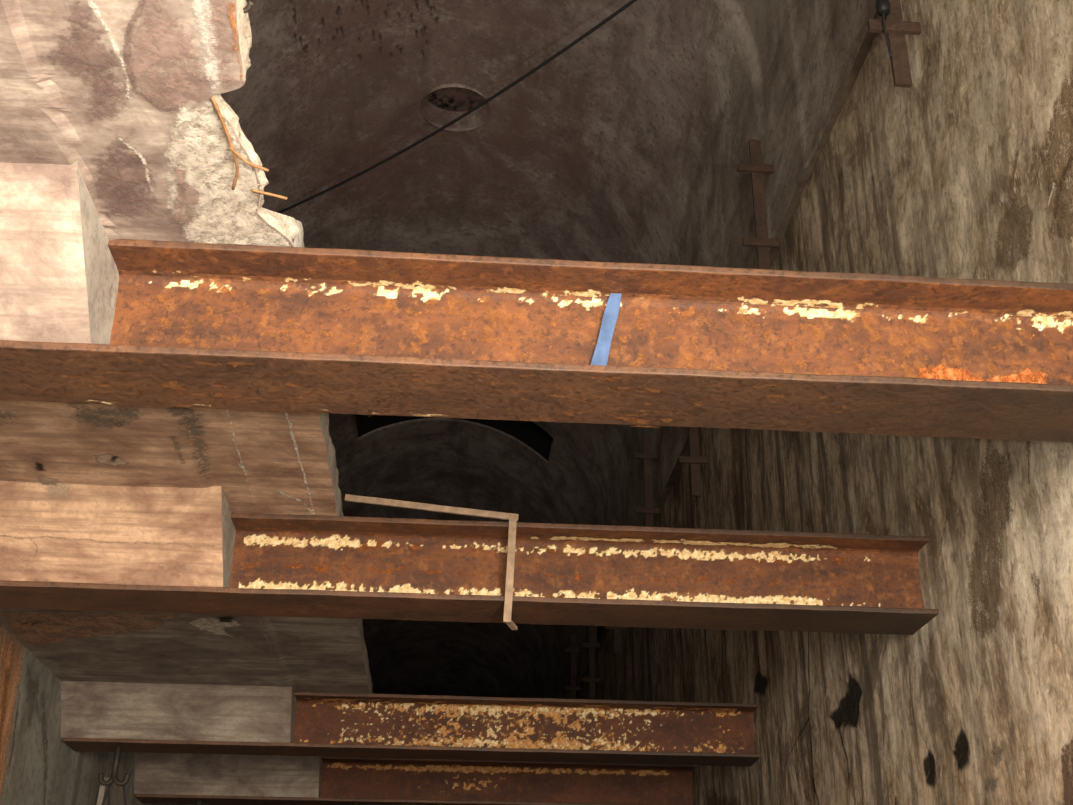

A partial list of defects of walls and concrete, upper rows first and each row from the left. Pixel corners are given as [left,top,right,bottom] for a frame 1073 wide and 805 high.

peeling [165,271,231,292]
peeling [281,277,456,302]
peeling [478,287,610,310]
peeling [719,296,927,323]
peeling [995,309,1073,333]
rust [919,364,1047,384]
peeling [244,535,423,550]
peeling [443,536,838,563]
peeling [238,578,823,606]